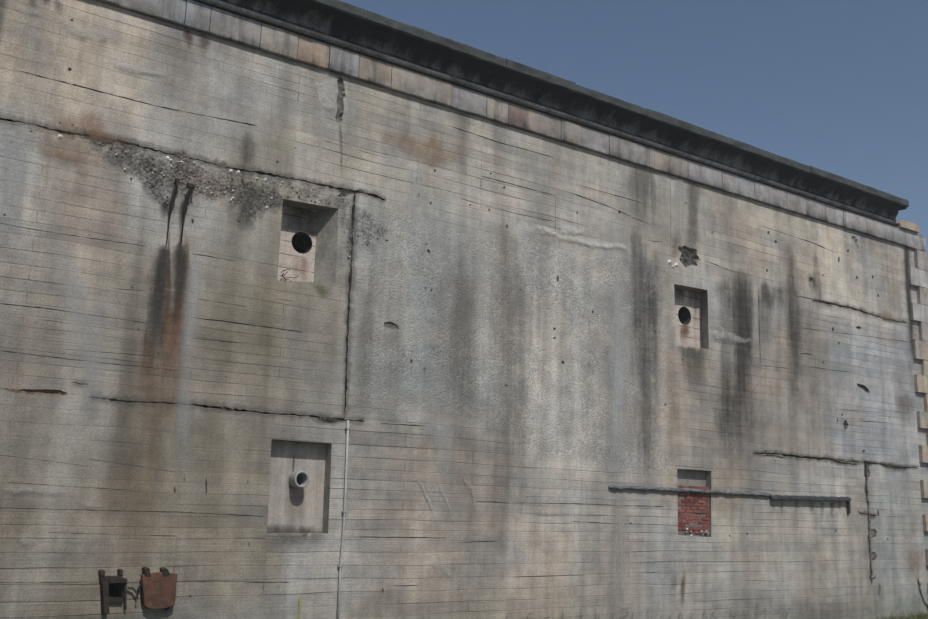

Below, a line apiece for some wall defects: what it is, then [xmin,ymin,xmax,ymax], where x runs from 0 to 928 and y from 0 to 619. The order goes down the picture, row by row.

spalling [97,142,364,221]
rust [162,240,188,363]
crack [0,117,385,423]
spalling [667,245,701,268]
damp [733,279,751,423]
crack [812,300,906,323]
crack [752,451,917,593]